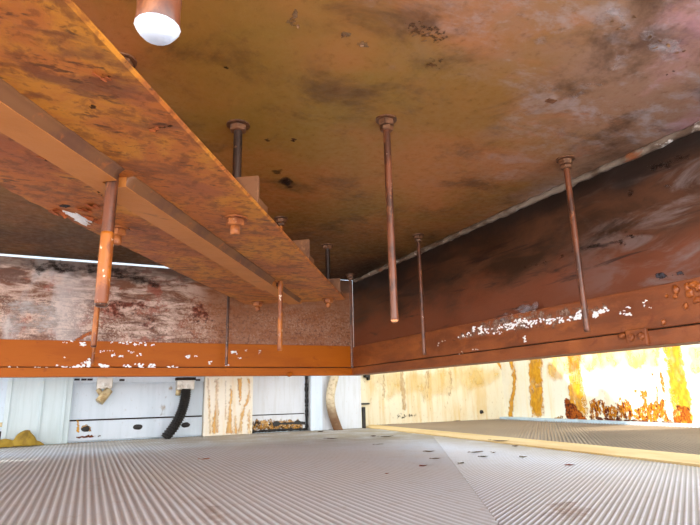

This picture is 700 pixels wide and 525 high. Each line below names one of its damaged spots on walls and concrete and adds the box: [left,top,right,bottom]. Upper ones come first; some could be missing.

corrosion [408,21,448,42]
peeling [48,204,102,226]
leakage [35,260,75,272]
leakage [111,268,158,288]
peeling [458,304,609,342]
peeling [34,341,156,368]
corrosion [529,346,693,424]
corrosion [208,379,305,434]